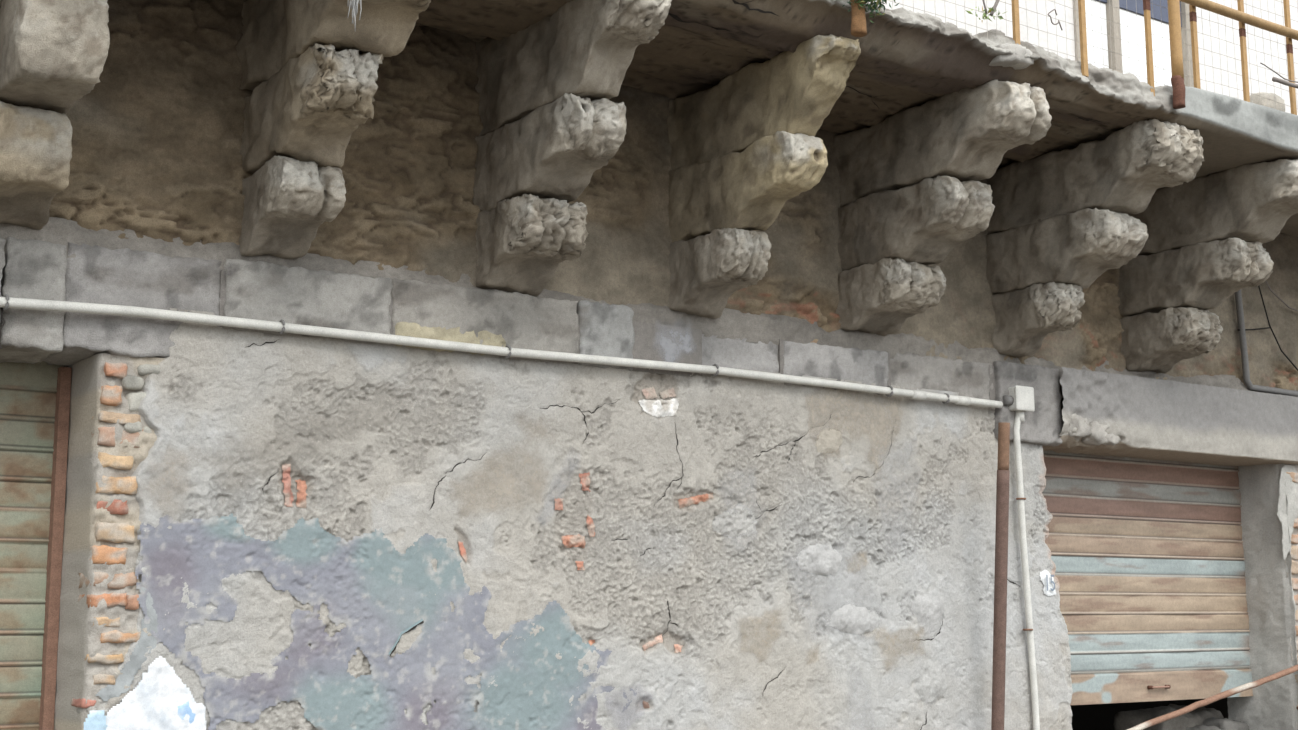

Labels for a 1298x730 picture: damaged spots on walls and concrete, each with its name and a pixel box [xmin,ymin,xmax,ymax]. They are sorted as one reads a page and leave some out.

flaking render [638,387,679,417]
crack [654,425,683,506]
flaking render [678,493,713,508]
peeling [135,464,649,730]
peeling [84,710,108,730]